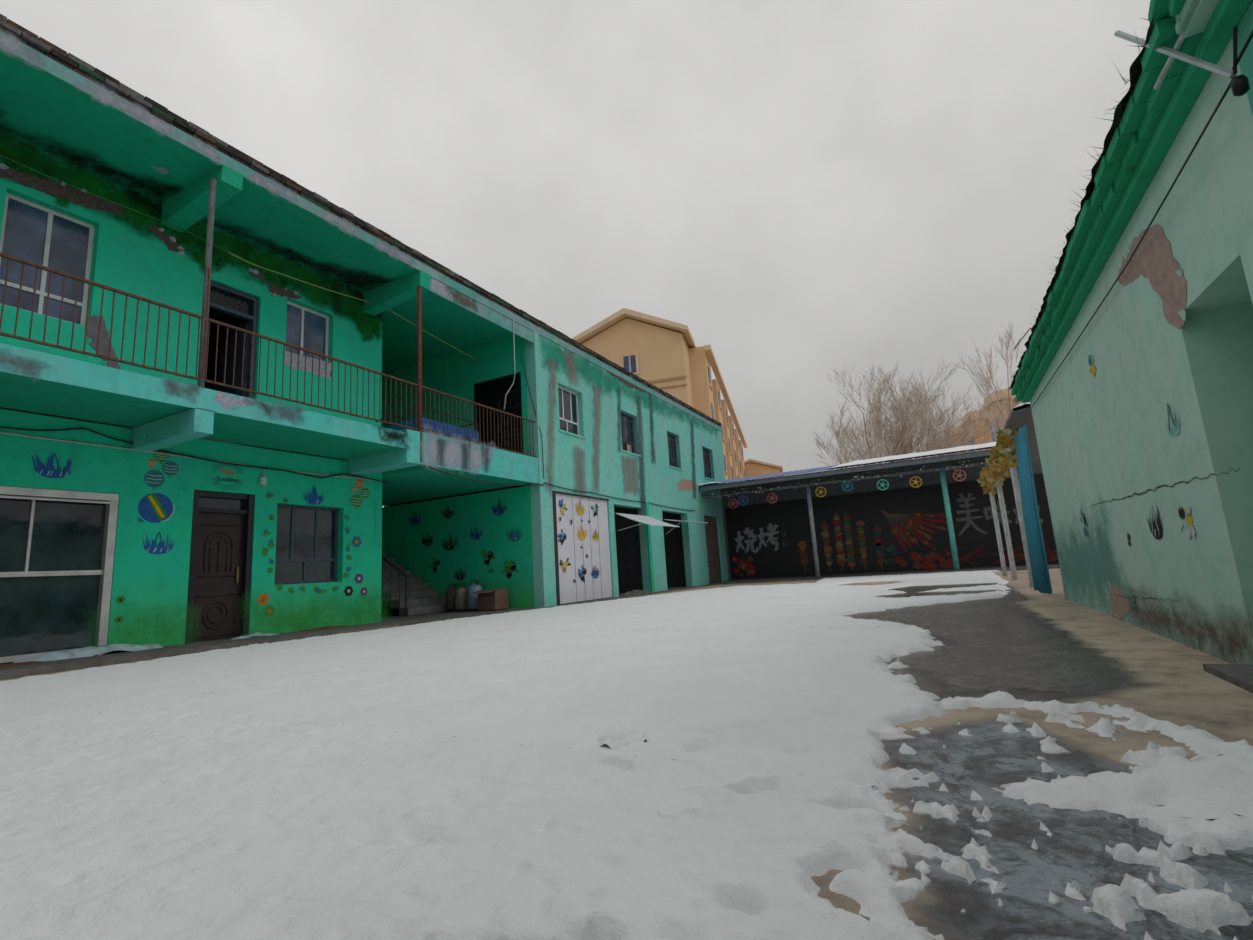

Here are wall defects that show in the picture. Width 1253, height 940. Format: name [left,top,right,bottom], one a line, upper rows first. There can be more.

spalling [0,163,125,215]
spalling [146,225,193,255]
damp [0,124,394,341]
peeling [86,313,121,369]
damp [541,340,717,516]